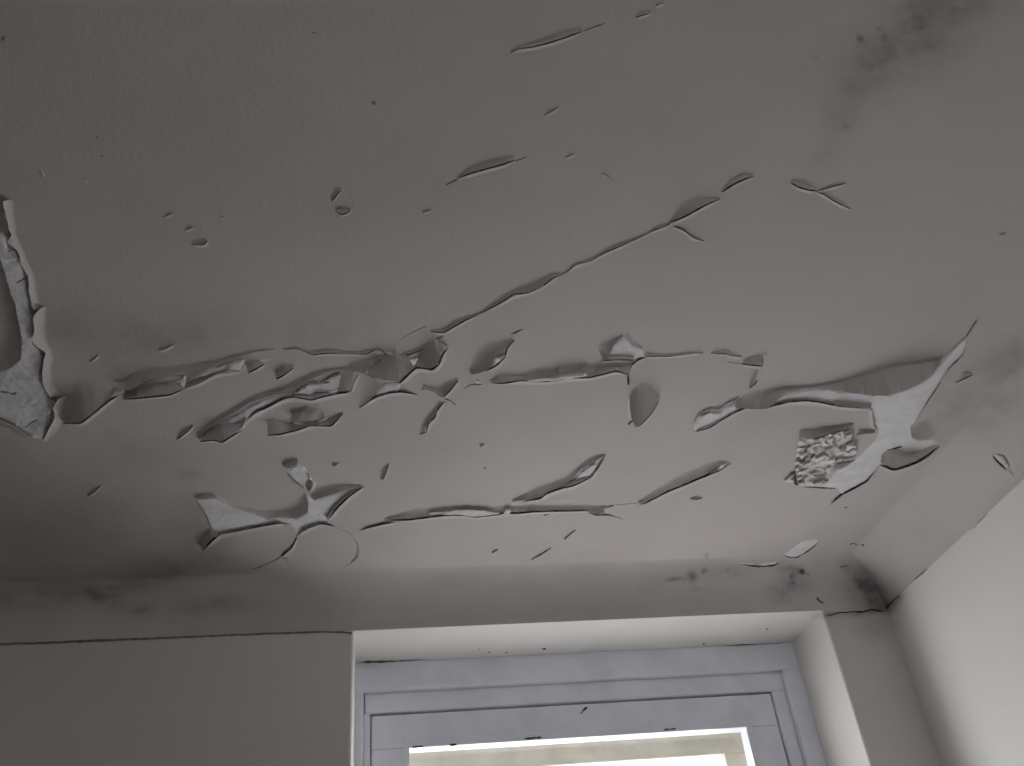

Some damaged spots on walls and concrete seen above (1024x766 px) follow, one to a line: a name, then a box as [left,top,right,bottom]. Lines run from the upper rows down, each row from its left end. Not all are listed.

crack [400,174,753,340]
peeling [0,200,449,445]
peeling [464,329,660,428]
peeling [694,320,978,505]
peeling [195,458,365,570]
peeling [360,454,731,531]
peeling [782,540,819,558]